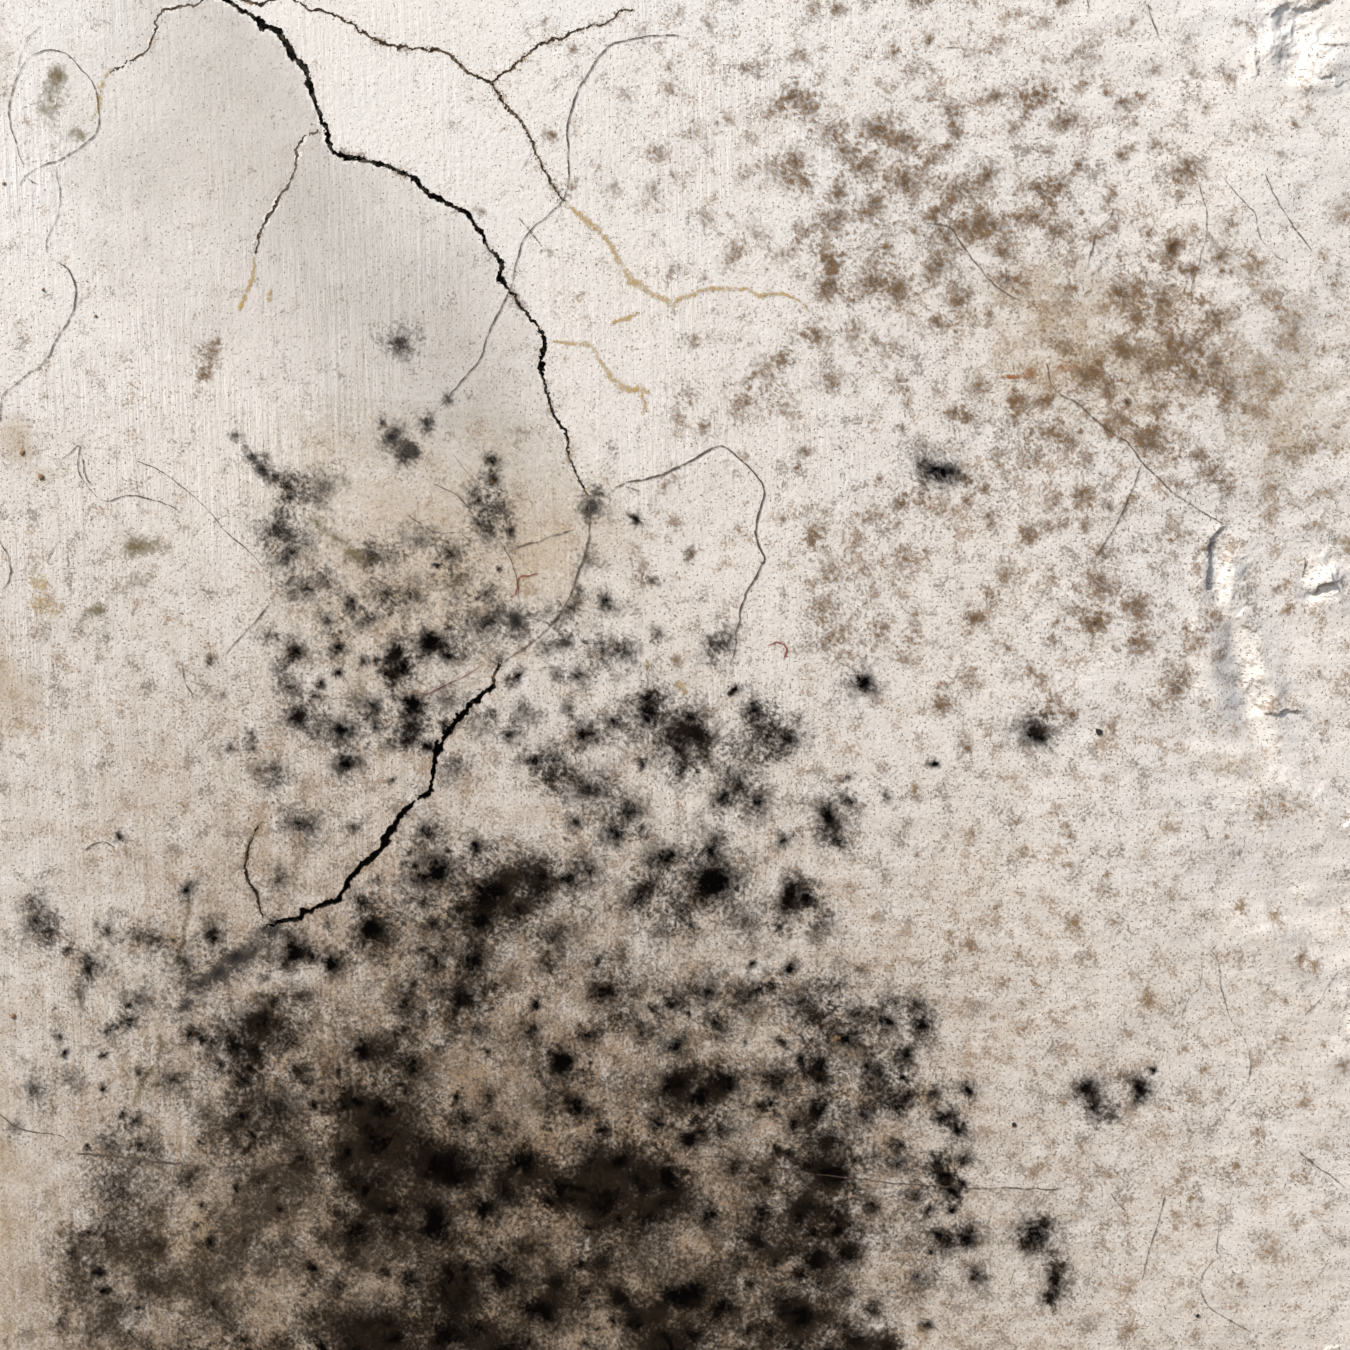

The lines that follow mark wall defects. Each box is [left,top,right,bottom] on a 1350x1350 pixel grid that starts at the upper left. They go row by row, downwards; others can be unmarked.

leakage [570,89,1088,307]
mould [1109,227,1306,417]
leakage [231,433,329,600]
crack [0,0,765,929]
mould [863,459,988,526]
leakage [265,585,637,776]
leakage [518,655,768,934]
leakage [737,700,799,758]
leakage [778,796,854,849]
mould [1013,694,1076,747]
leakage [46,823,980,1350]
mould [1015,1216,1068,1306]